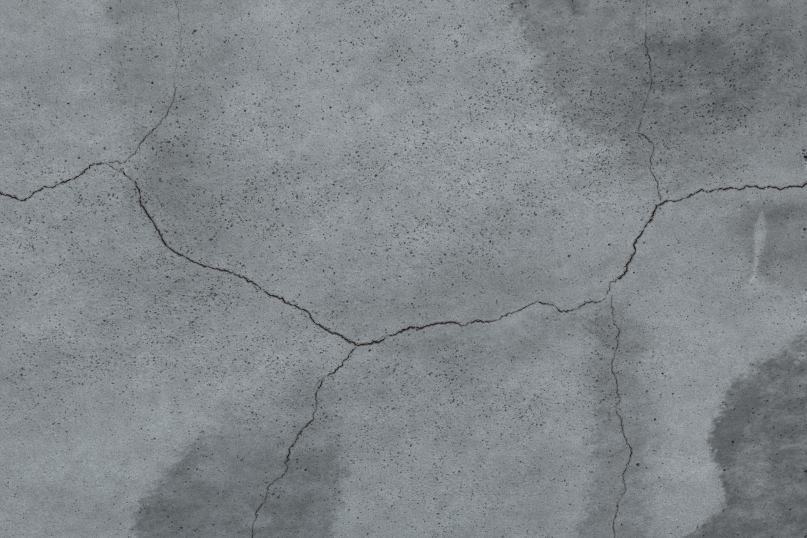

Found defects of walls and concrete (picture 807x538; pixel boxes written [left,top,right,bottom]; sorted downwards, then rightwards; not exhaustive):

crack [0,0,387,538]
damp [128,374,349,538]
damp [303,245,670,538]
crack [378,0,807,341]
crack [607,296,633,538]
damp [673,339,807,538]